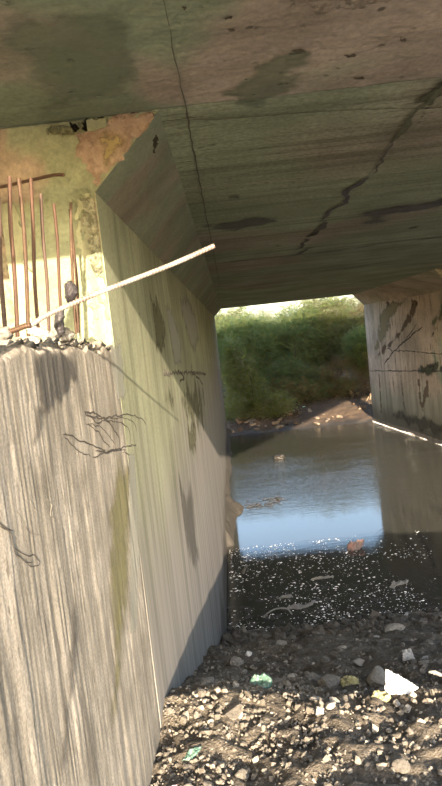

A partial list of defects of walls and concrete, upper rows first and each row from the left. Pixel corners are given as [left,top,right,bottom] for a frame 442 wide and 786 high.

leakage [224,53,309,105]
spalling [46,112,155,186]
crack [213,82,442,273]
spalling [0,173,215,337]
crack [384,325,422,365]
crack [62,411,146,458]
crack [0,496,54,567]